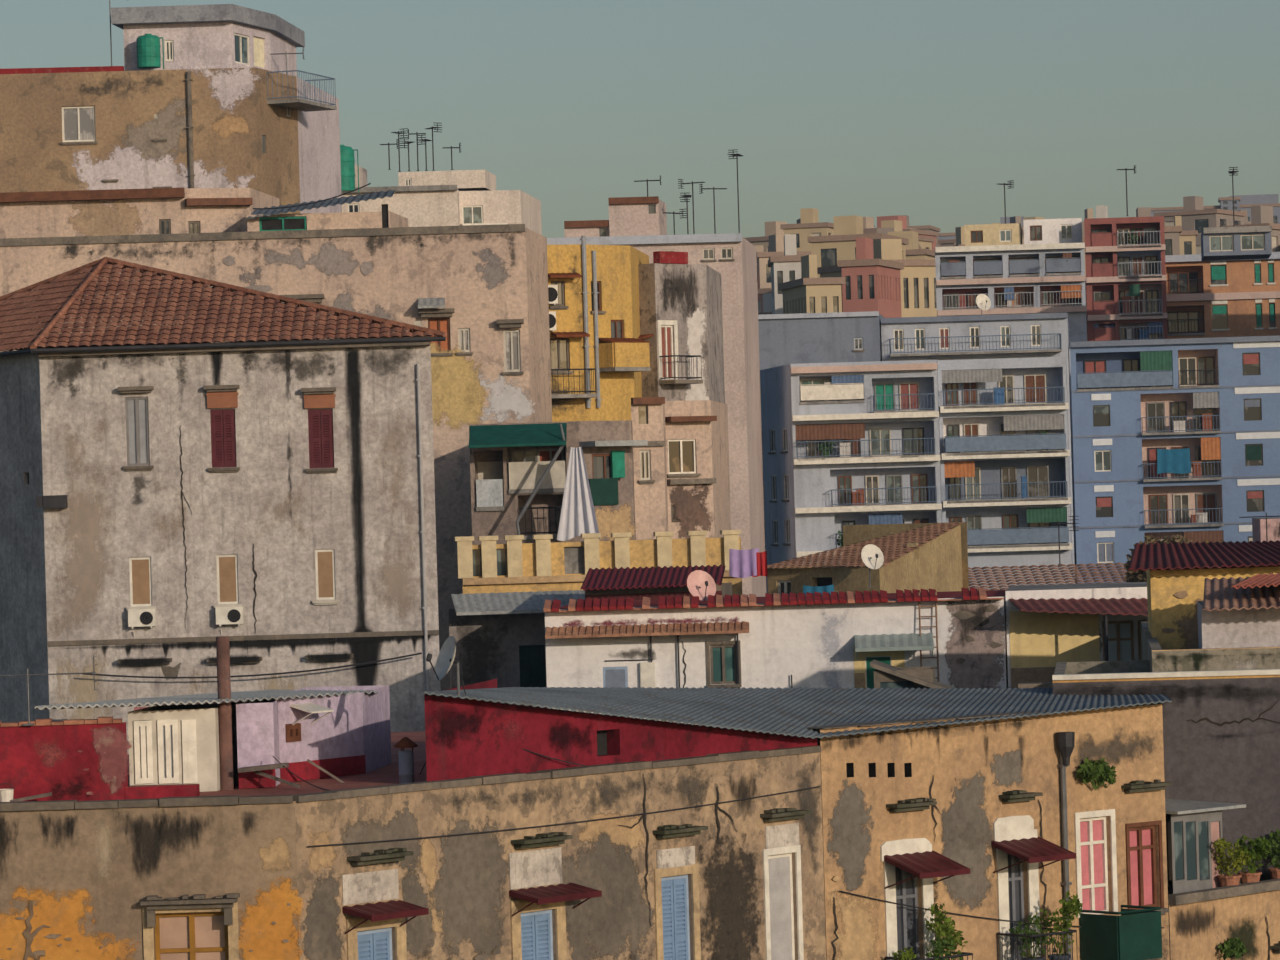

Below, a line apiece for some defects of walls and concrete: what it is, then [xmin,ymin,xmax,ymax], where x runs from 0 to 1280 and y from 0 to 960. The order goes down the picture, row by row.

spalling [212,114,250,139]
peeling [223,242,396,339]
peeling [473,248,510,289]
damp [663,272,697,316]
damp [53,347,430,719]
spalling [670,484,714,539]
damp [961,606,985,640]
damp [0,823,8,864]
damp [44,820,74,843]
damp [129,818,202,873]
peeling [0,887,138,960]
peeling [238,837,303,960]